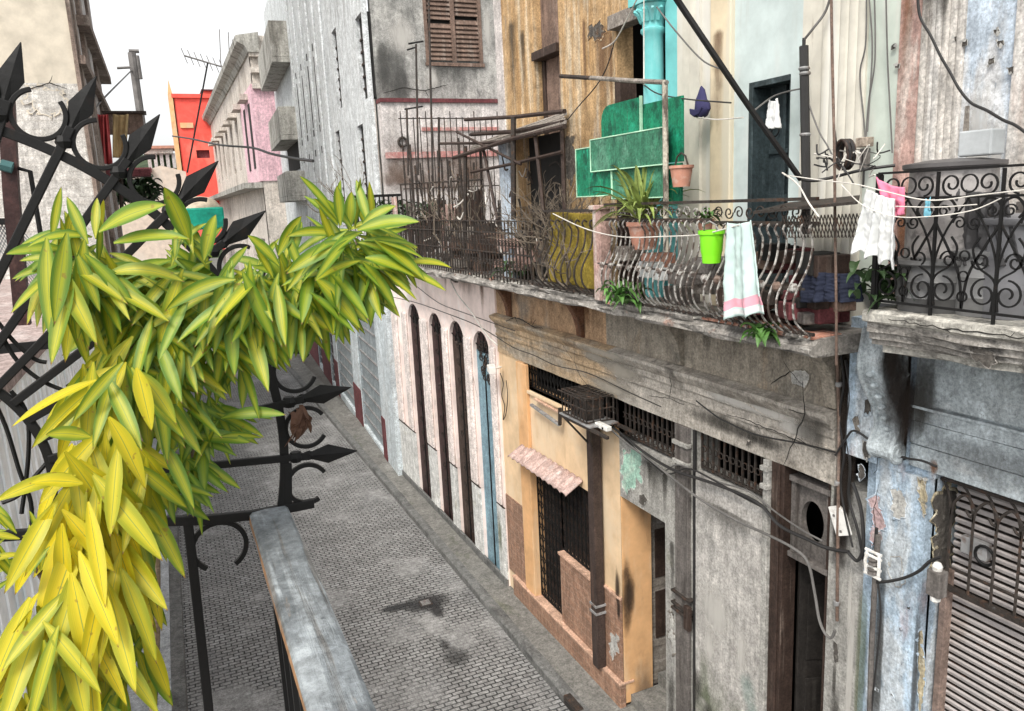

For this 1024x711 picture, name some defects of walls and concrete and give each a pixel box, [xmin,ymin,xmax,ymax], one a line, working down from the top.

spalling [789,369,810,391]
crack [727,361,828,466]
peeling [619,445,648,506]
spalling [865,476,960,569]
leakage [617,581,634,618]